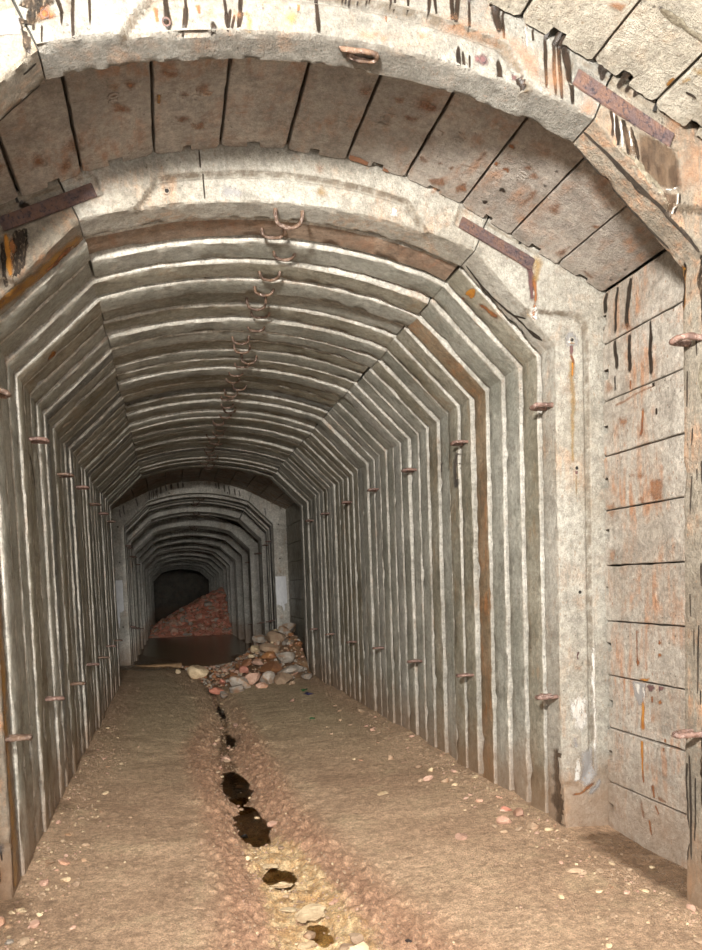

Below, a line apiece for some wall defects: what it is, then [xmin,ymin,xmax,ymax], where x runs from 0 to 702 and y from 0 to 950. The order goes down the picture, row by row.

damp [154,0,201,37]
damp [211,0,243,36]
damp [449,0,471,31]
damp [491,5,505,38]
damp [525,28,574,104]
rust [0,228,82,309]
rust [519,259,540,302]
rust [566,333,578,489]
rust [0,607,17,888]